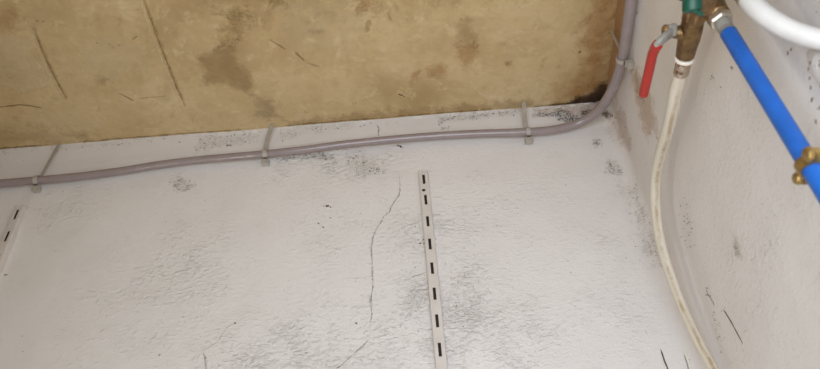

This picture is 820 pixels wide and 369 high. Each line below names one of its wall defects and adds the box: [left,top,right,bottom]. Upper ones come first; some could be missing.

water stain [537,84,607,122]